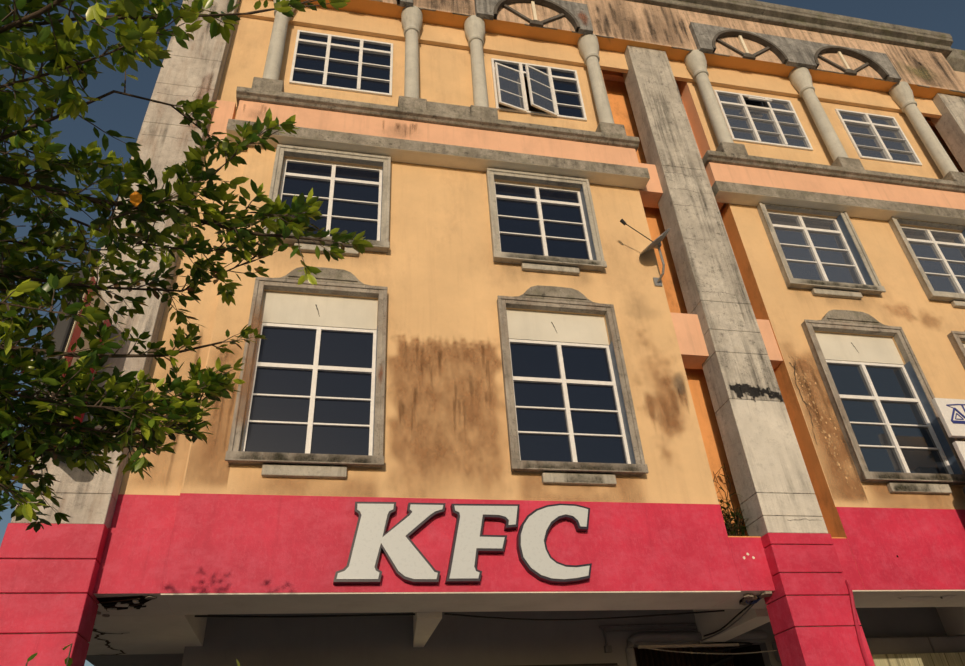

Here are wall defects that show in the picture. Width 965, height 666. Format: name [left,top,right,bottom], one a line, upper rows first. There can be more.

leakage [391,339,501,473]
leakage [649,377,687,432]
peeling [729,383,784,402]
crack [789,357,818,446]
crack [87,624,126,656]